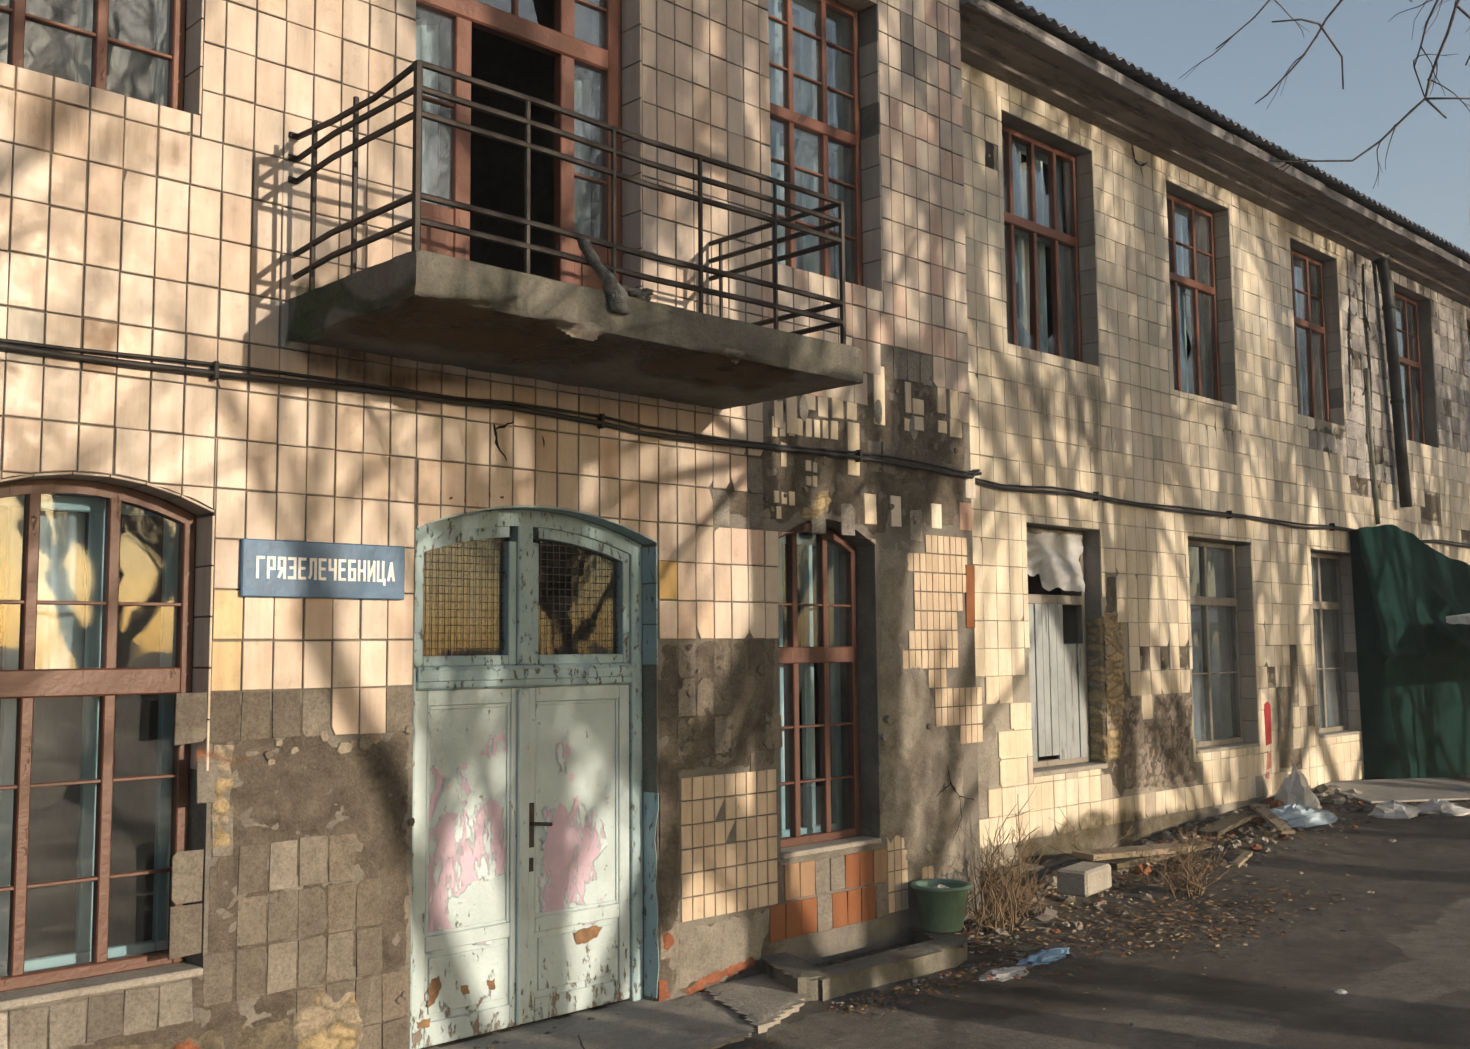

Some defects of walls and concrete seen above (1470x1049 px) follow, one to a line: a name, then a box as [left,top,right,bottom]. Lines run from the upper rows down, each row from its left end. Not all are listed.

peeling [712,347,966,542]
peeling [1306,248,1470,498]
peeling [1086,576,1197,797]
peeling [69,688,507,1049]
peeling [537,728,608,945]